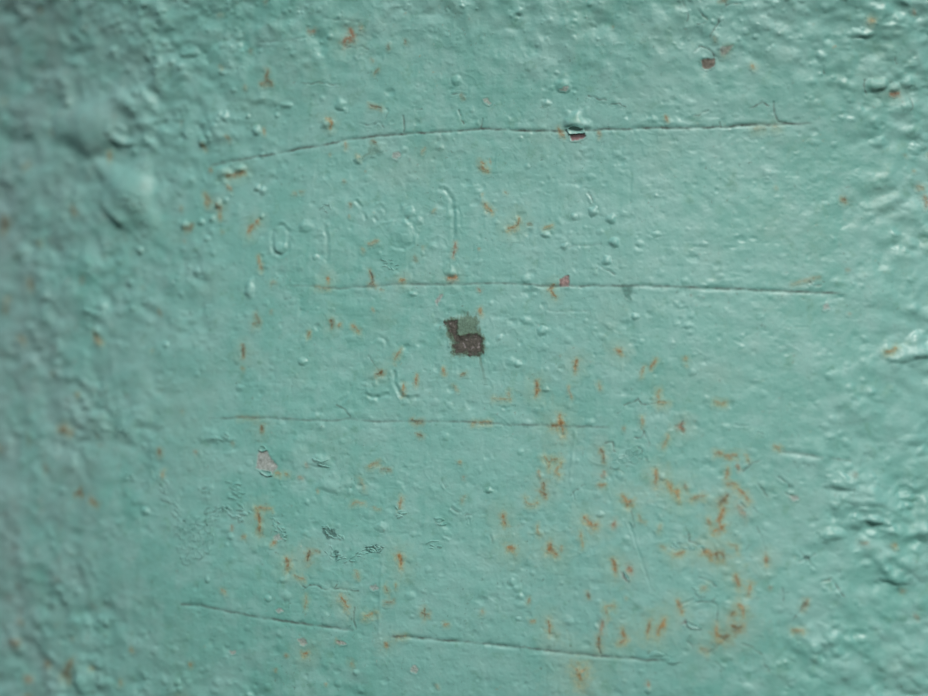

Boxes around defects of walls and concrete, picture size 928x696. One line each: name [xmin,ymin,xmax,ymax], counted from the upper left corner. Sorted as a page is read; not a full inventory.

crack [198,92,826,173]
peeling [566,126,587,142]
crack [269,220,858,302]
peeling [438,311,489,385]
rust [636,383,774,660]
crack [171,581,546,658]